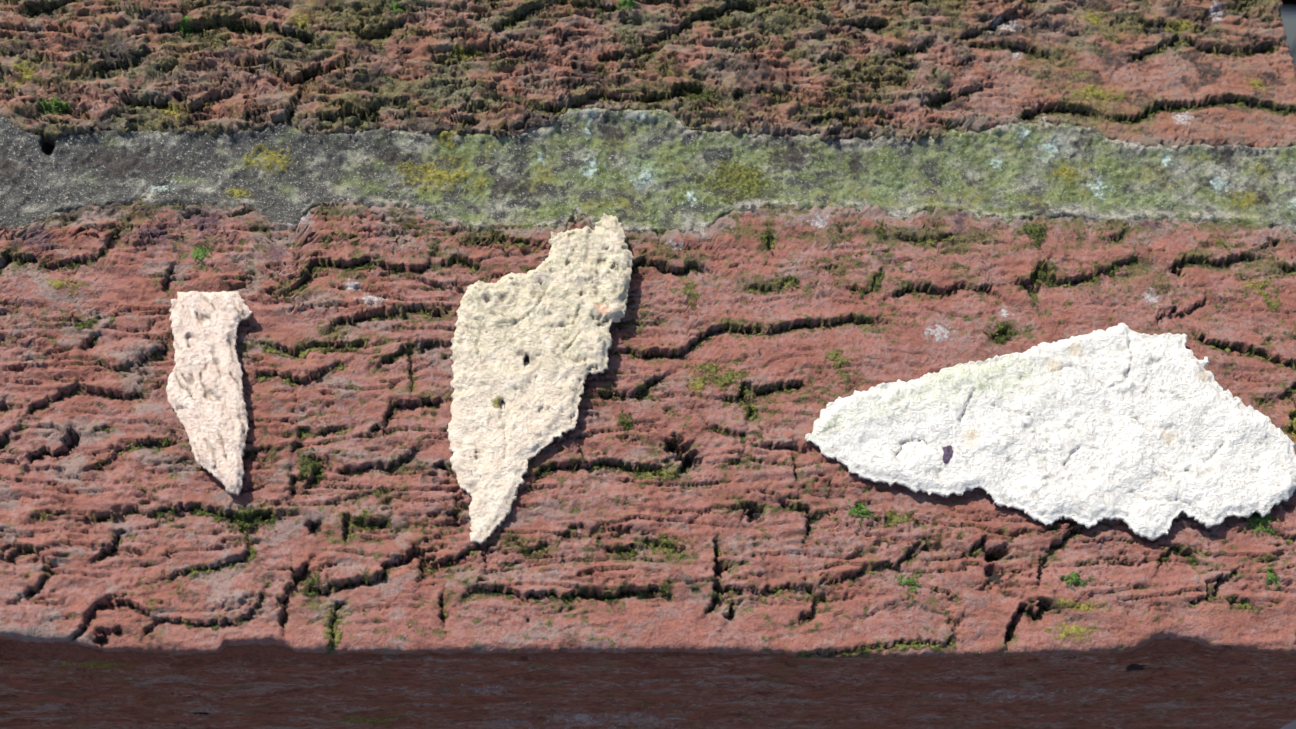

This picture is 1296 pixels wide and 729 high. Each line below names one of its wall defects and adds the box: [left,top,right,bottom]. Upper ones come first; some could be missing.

peeling [166,291,253,496]
peeling [447,213,634,545]